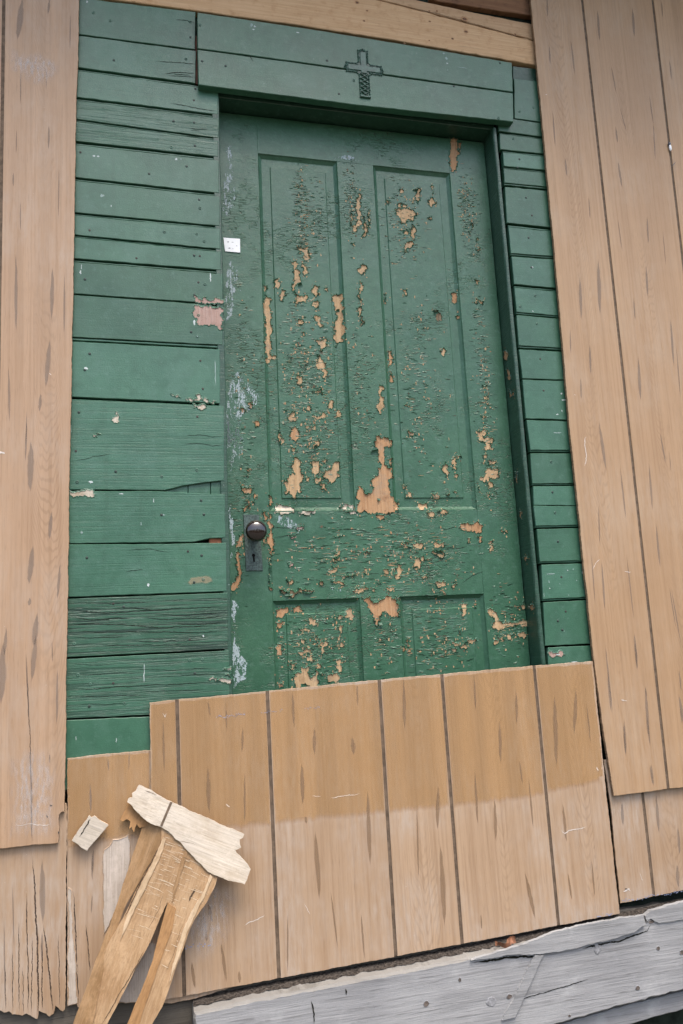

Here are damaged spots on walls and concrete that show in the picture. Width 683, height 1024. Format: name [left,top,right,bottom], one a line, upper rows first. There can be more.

peeling [447,137,462,173]
peeling [348,192,371,247]
peeling [385,185,437,255]
peeling [191,294,225,331]
peeling [170,393,216,411]
crack [189,151,526,688]
peeling [239,246,535,690]
peeling [230,531,244,594]
crack [5,670,90,1015]
crack [472,955,533,963]
crack [586,926,650,948]
crack [524,979,587,999]